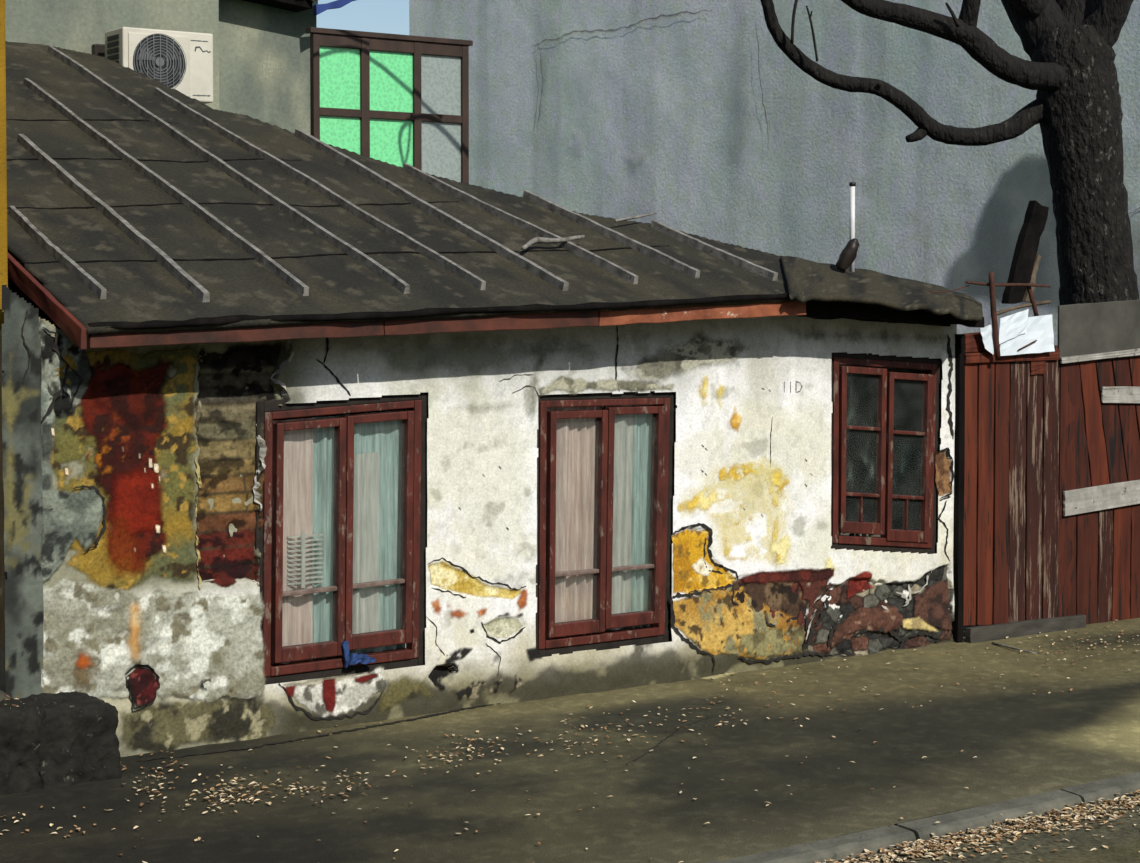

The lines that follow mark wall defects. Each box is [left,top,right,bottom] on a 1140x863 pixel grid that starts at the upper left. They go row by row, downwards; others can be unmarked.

crack [531,10,711,130]
crack [316,338,351,396]
peeling [39,320,294,710]
flaking render [429,557,527,644]
flaking render [672,523,829,628]